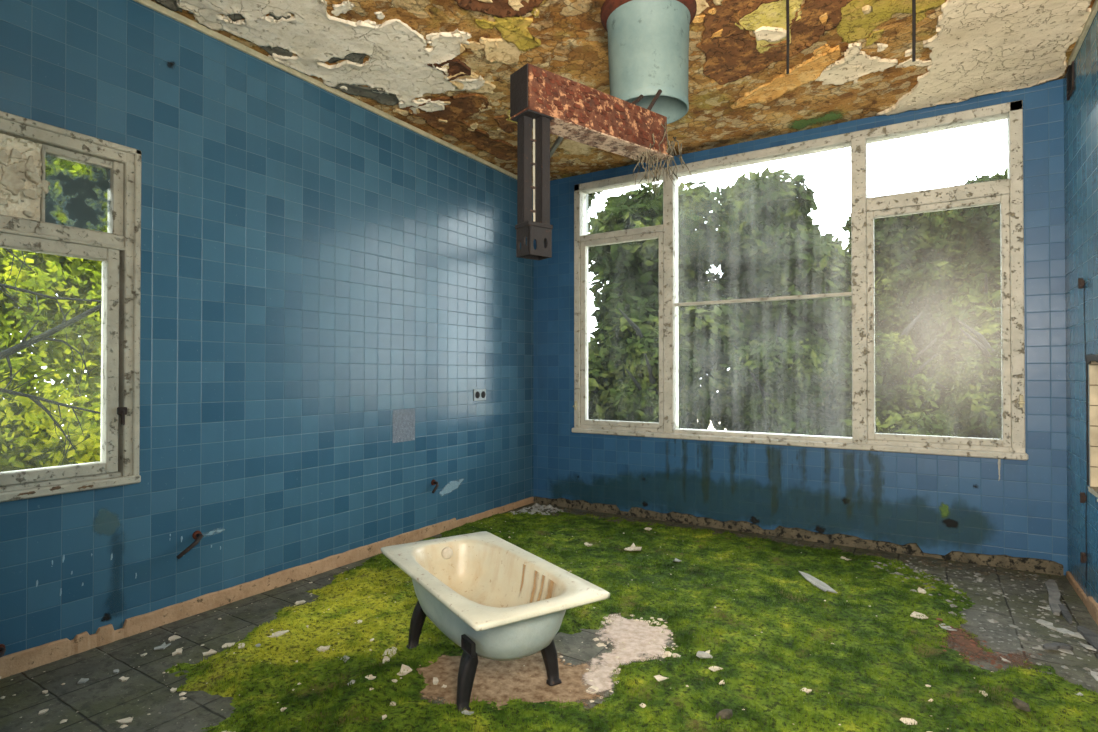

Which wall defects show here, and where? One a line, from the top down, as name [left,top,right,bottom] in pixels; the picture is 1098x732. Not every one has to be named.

peeling [155,0,543,161]
peeling [550,135,591,155]
corrosion [531,67,666,150]
peeling [693,0,1091,116]